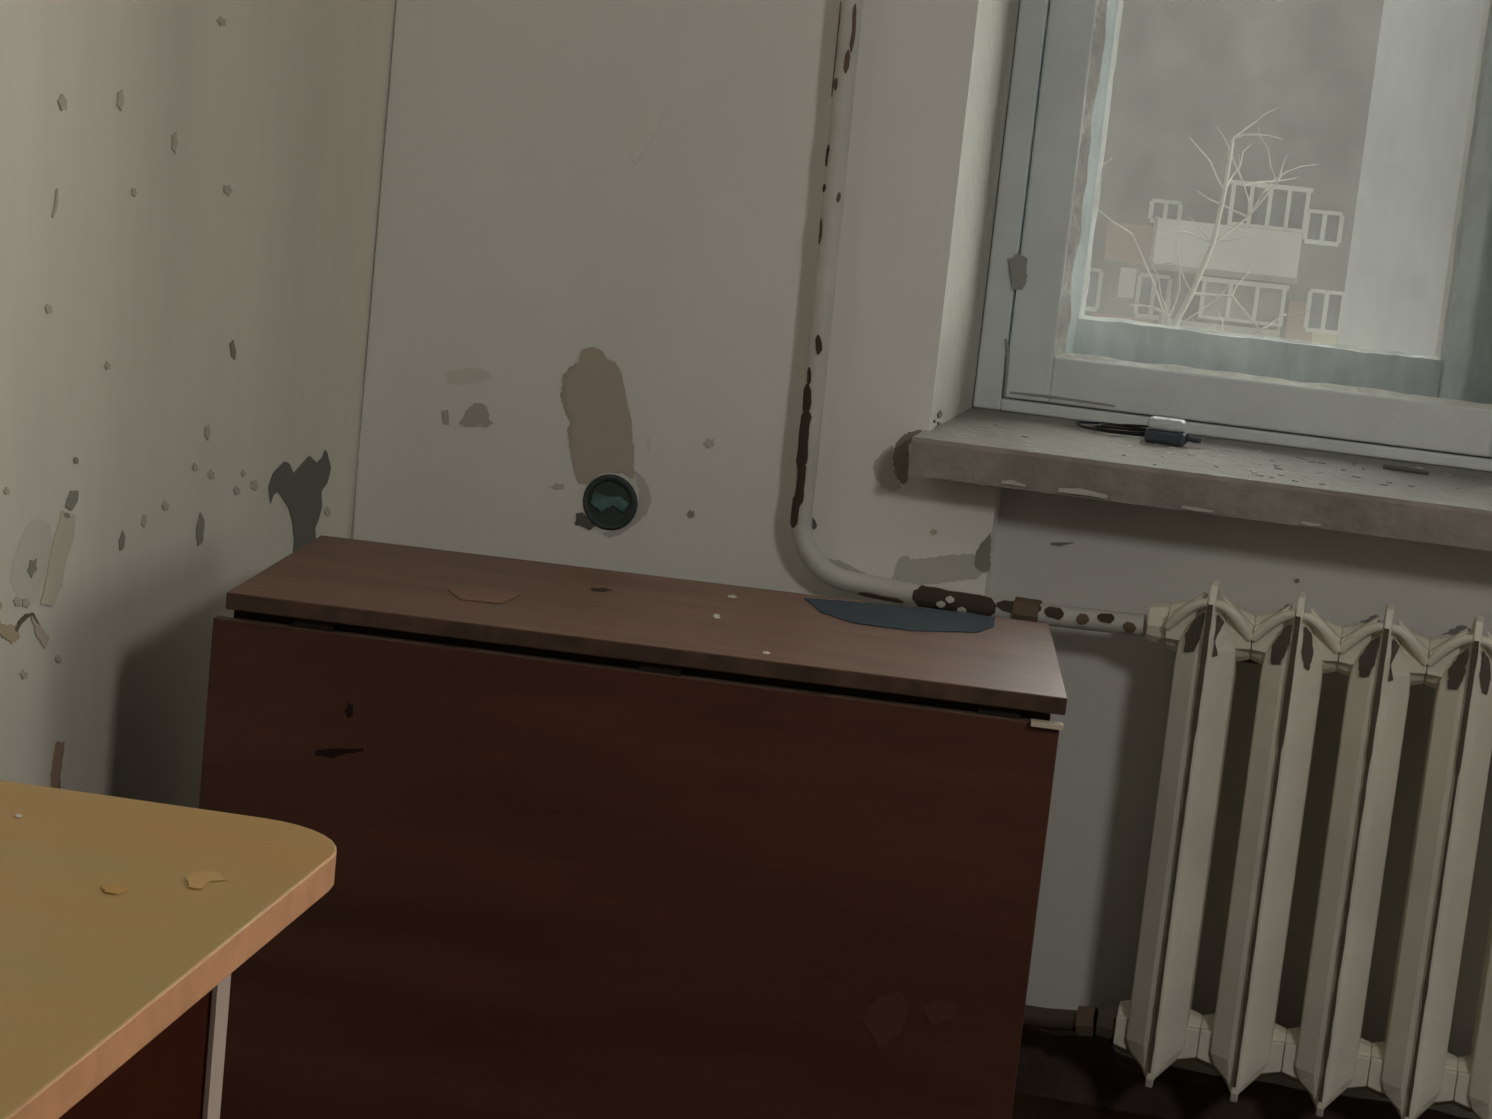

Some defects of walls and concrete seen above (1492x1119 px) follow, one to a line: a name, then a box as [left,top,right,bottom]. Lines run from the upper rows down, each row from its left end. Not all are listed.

rust [831,1,857,97]
rust [822,145,841,203]
peeling [564,347,634,484]
rust [790,335,822,528]
peeling [64,491,79,519]
flaking render [251,450,331,552]
peeling [27,559,37,578]
peeling [0,602,49,649]
rust [858,585,1014,616]
rust [1038,606,1136,633]